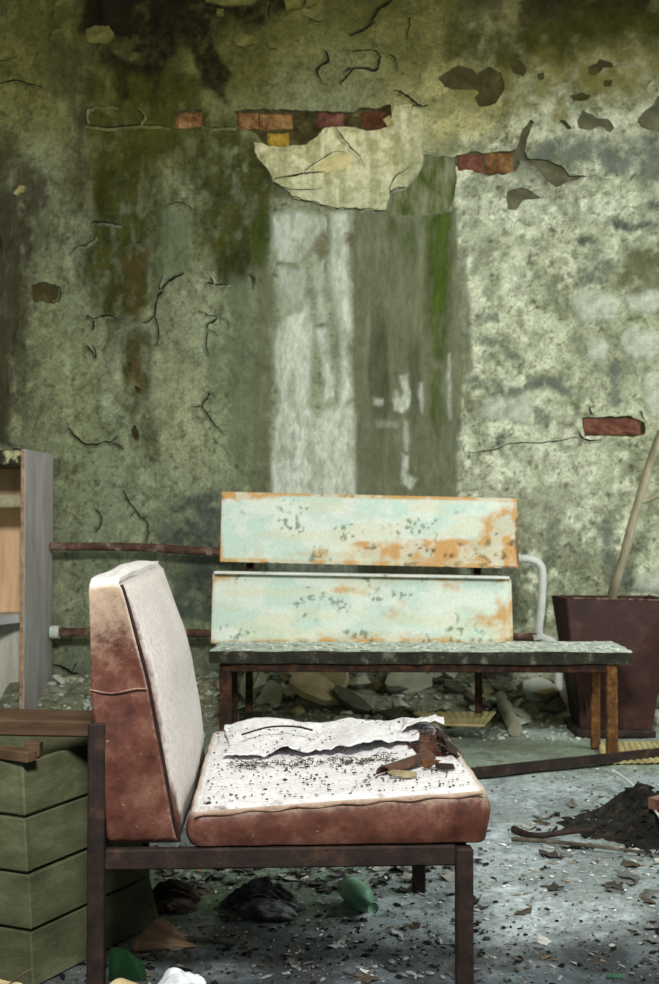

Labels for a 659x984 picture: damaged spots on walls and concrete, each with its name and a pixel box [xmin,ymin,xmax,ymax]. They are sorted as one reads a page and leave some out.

damp [84,0,286,103]
crack [303,0,430,111]
spalling [439,59,545,107]
damp [448,6,659,71]
spalling [637,96,659,132]
peeling [235,103,588,216]
crack [143,271,184,345]
crack [198,310,218,357]
damp [253,212,571,497]
crack [66,422,123,450]
flaking render [582,415,646,437]
damp [269,563,458,575]